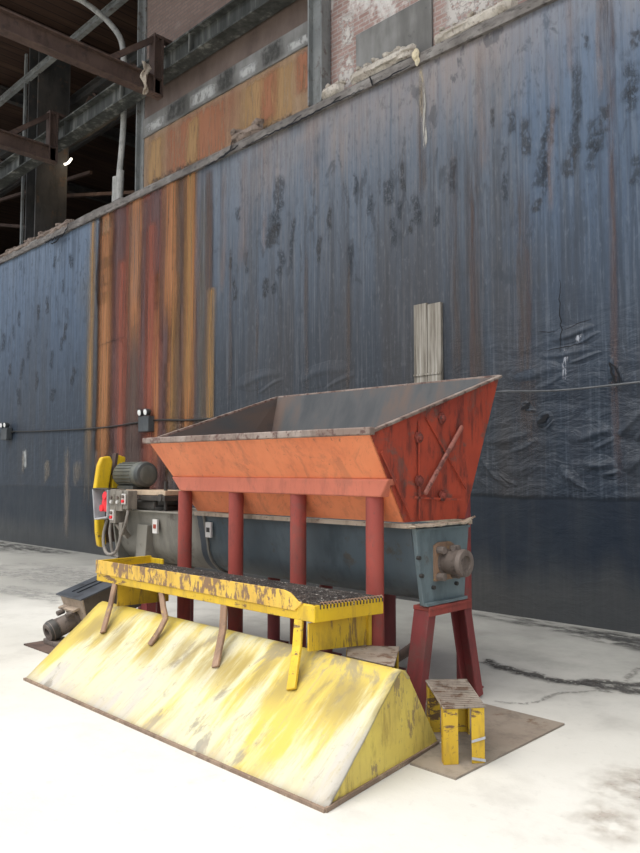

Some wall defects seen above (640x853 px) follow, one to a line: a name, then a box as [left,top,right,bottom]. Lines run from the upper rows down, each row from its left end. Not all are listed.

damp [147,63,255,130]
damp [290,35,308,50]
flaking render [339,14,353,46]
spalling [321,43,416,100]
efflorescence [412,48,427,144]
rust [88,172,195,475]
rust [205,172,214,418]
crack [539,283,591,351]
crack [481,659,640,694]